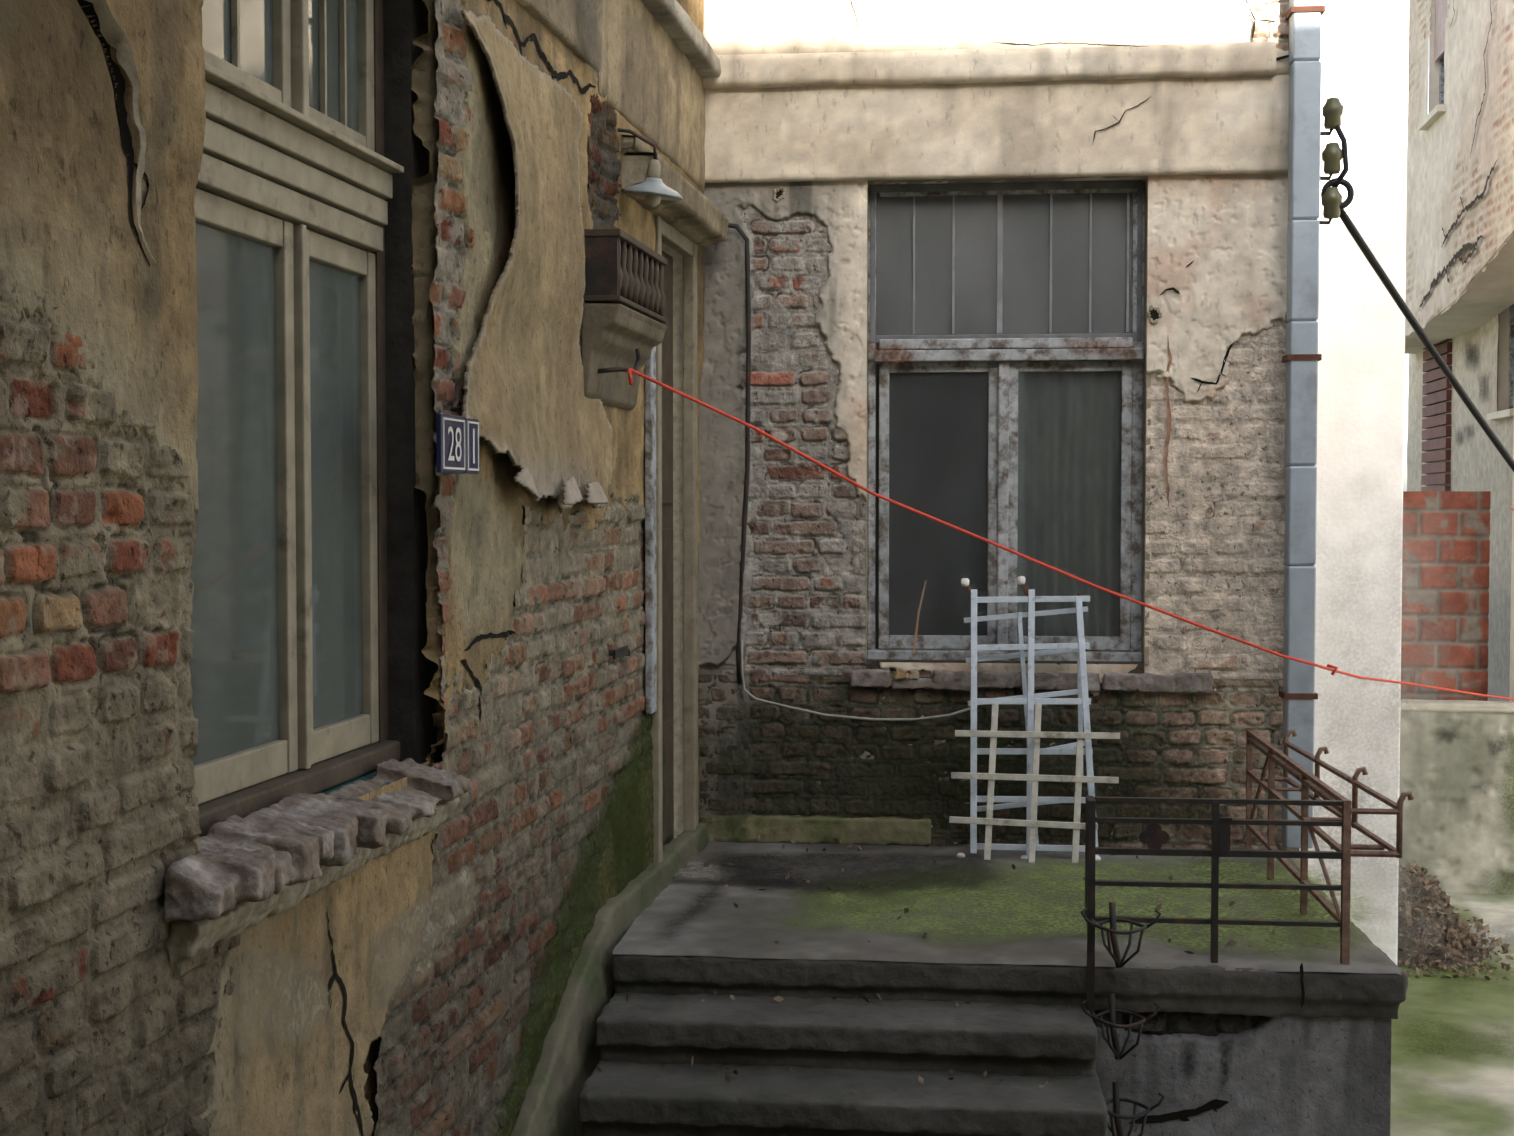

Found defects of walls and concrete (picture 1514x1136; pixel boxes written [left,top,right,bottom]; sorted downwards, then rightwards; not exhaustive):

crack [77,0,157,267]
crack [487,0,596,94]
flaking render [1252,0,1289,61]
crack [1418,0,1498,311]
flaking render [698,206,1299,851]
flaking render [0,257,240,1136]
crack [326,912,364,1136]